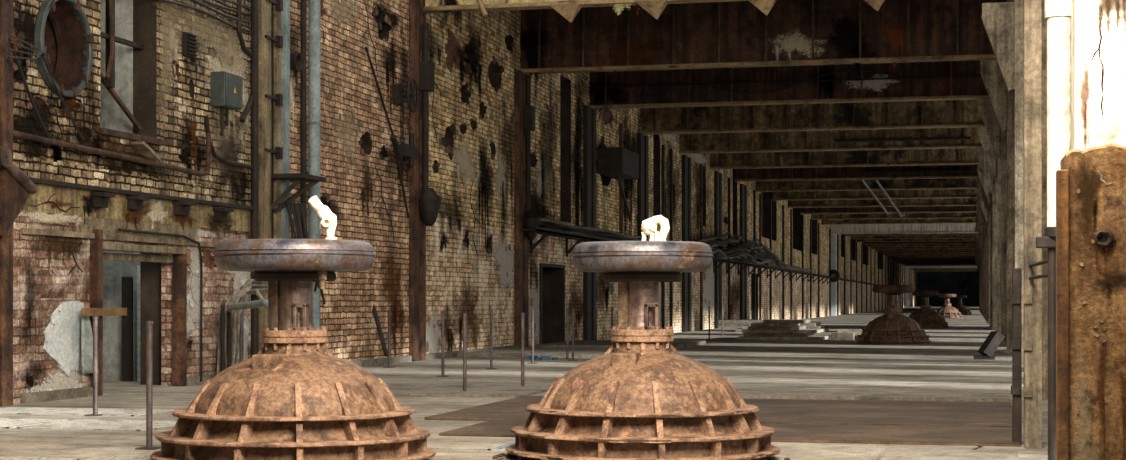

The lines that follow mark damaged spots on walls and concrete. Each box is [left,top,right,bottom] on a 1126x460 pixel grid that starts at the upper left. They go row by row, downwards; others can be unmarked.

spalling [372,2,392,42]
water stain [459,55,482,107]
water stain [775,31,820,60]
crack [1091,13,1104,116]
water stain [441,143,512,262]
peeling [24,301,85,393]